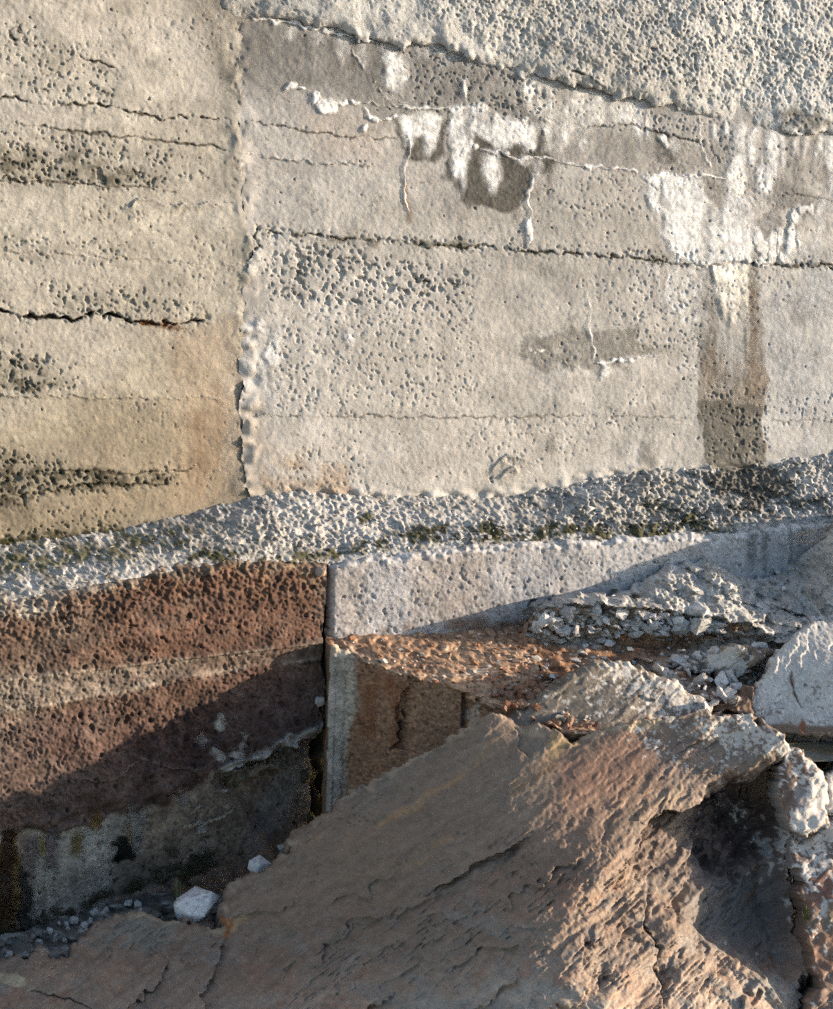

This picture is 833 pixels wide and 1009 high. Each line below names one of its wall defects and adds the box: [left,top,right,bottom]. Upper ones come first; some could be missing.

crack [40,102,411,211]
crack [0,308,200,326]
damp [205,0,833,526]
crack [418,174,833,270]